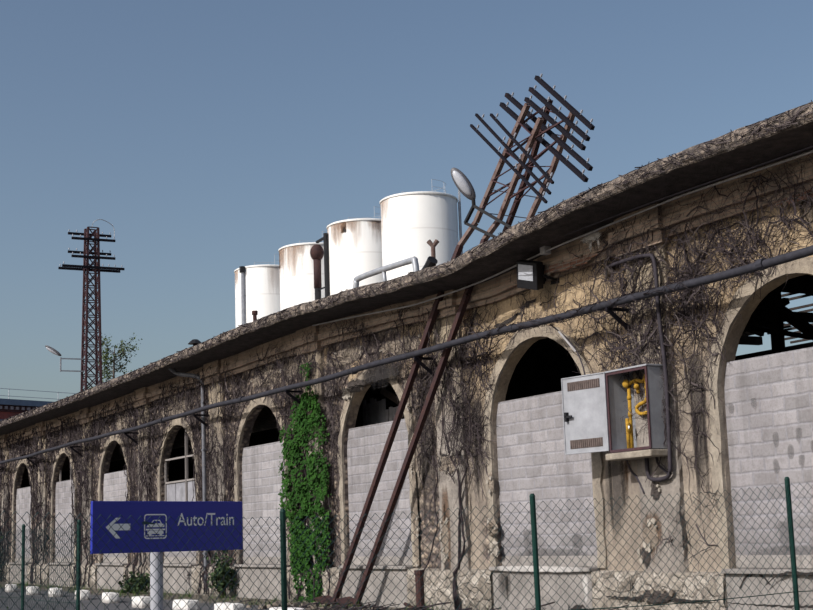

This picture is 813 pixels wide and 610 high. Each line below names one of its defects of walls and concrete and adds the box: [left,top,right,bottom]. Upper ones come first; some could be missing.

flaking render [637,518,658,569]
spalling [638,588,675,604]